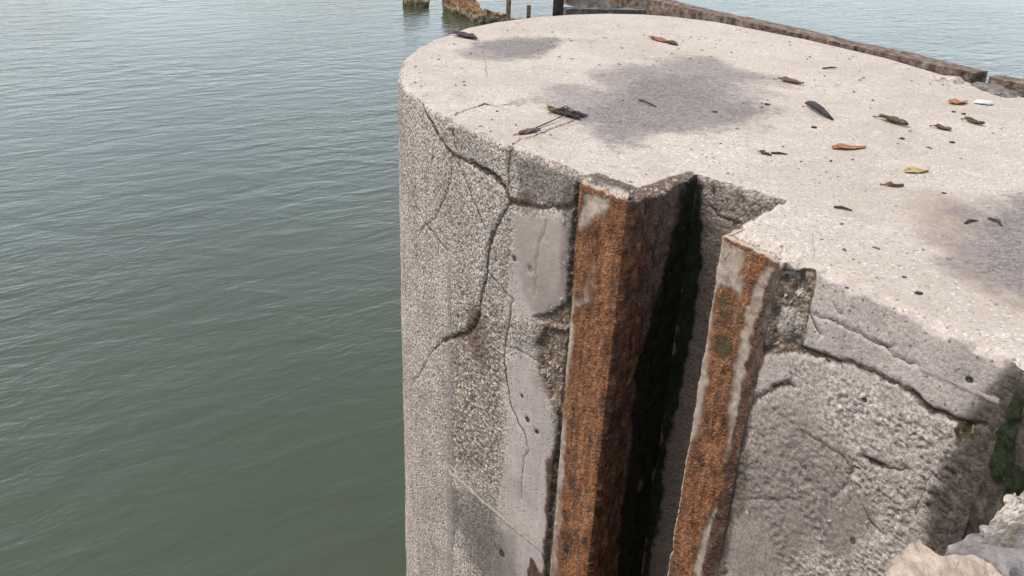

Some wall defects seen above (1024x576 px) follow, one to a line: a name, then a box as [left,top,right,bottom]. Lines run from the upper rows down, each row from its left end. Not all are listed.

crack [415,93,577,499]
rust [527,182,686,576]
peeling [535,171,694,576]
rust [668,237,783,576]
crack [751,382,794,408]
spalling [767,263,816,354]
crack [765,296,987,425]
crack [740,495,803,503]
crack [809,435,957,533]